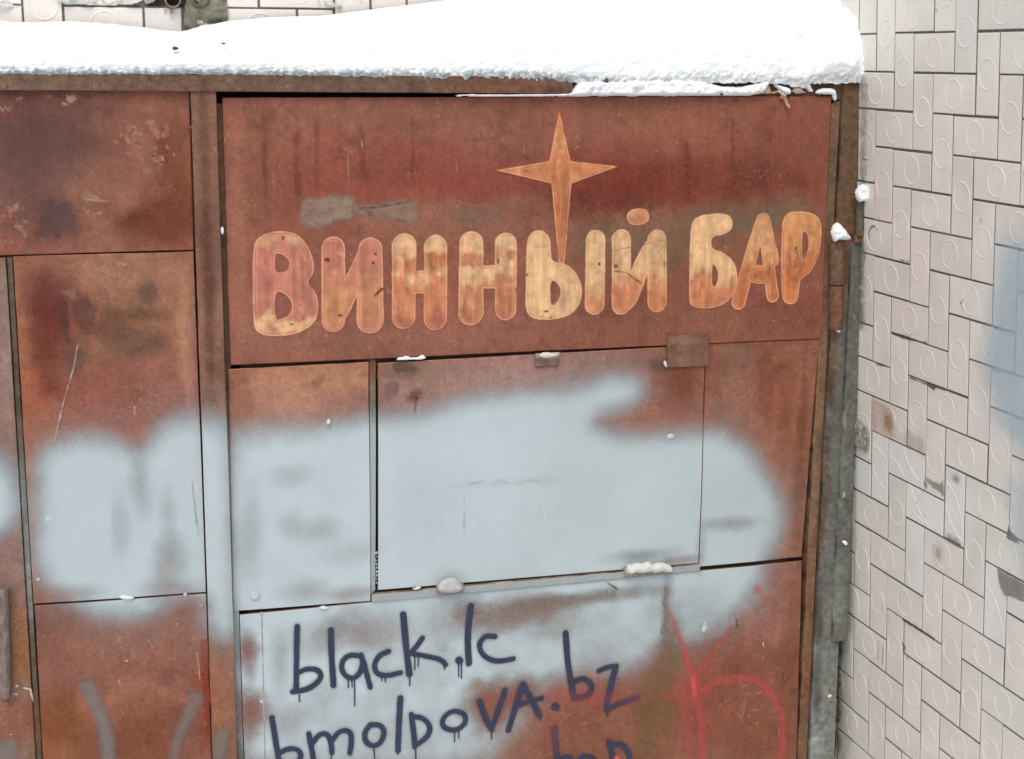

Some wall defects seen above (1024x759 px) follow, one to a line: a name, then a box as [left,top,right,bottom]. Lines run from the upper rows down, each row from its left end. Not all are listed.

corrosion [200,639,211,735]